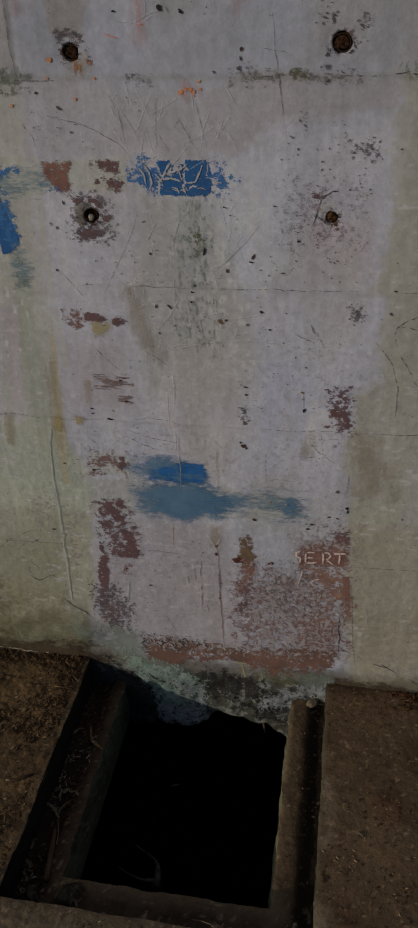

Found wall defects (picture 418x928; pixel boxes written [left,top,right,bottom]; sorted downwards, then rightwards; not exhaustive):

spalling [0,661,326,928]
damp [0,622,417,728]